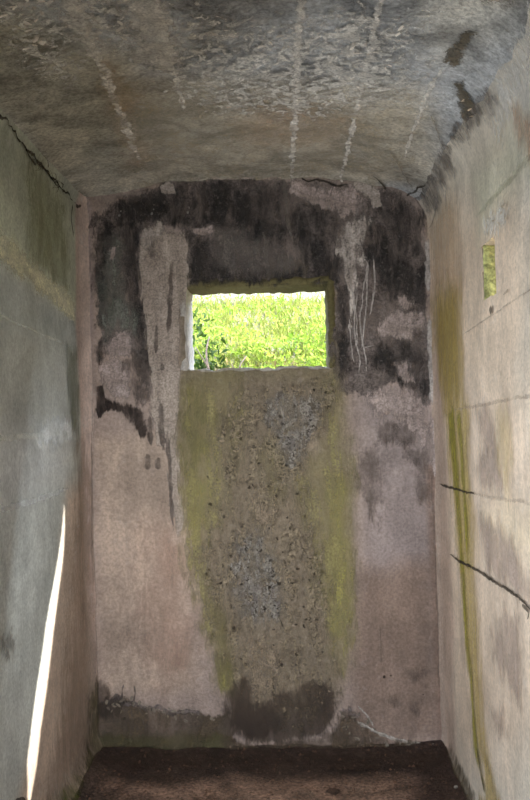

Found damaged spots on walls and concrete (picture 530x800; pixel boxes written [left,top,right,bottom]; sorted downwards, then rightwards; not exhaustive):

crack [0,114,81,236]
leakage [83,90,499,800]
crack [440,484,475,495]
crack [450,554,530,619]